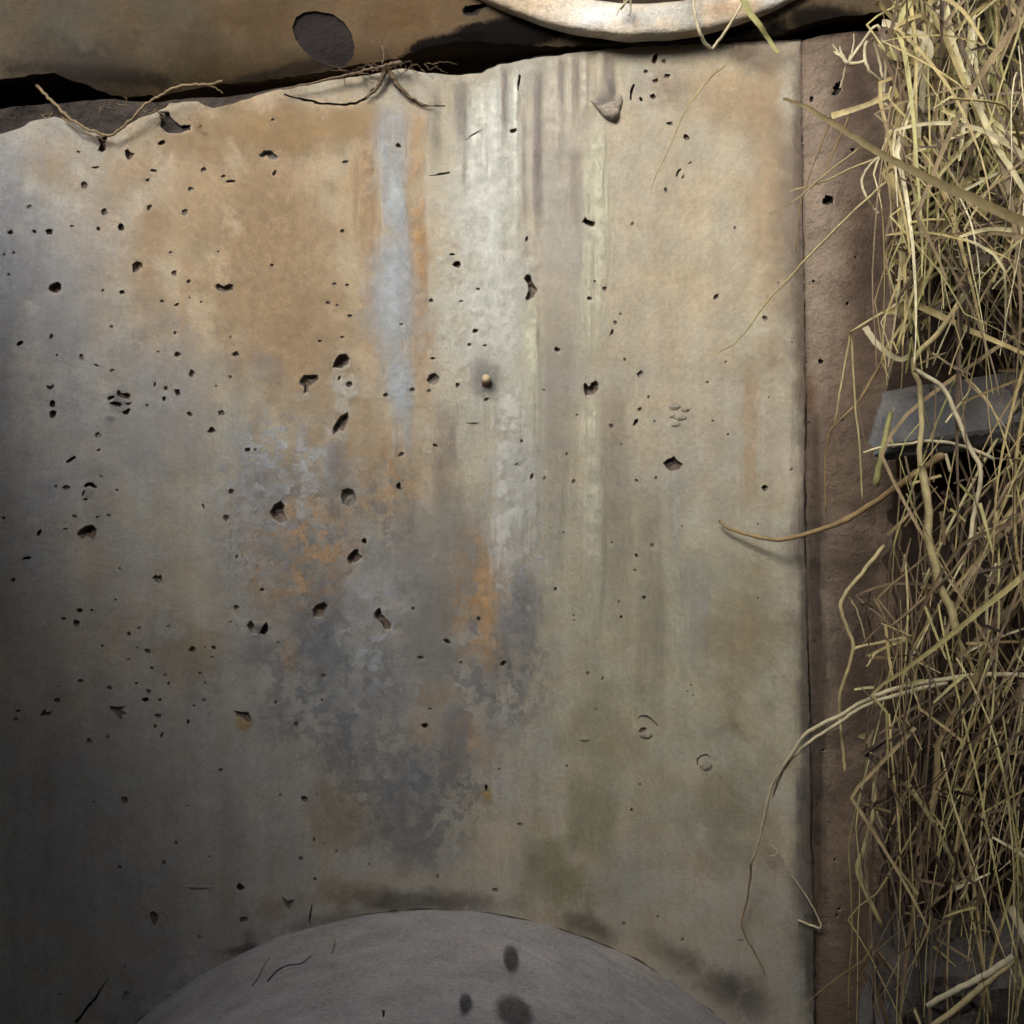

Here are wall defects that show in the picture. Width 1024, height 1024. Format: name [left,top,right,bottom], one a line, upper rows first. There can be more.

spalling [158,111,193,134]
damp [534,62,585,177]
damp [456,67,517,344]
damp [595,173,604,283]
damp [227,419,336,574]
rust [255,508,342,603]
damp [292,561,406,728]
rust [456,555,500,659]
damp [481,319,542,606]
damp [583,412,603,560]